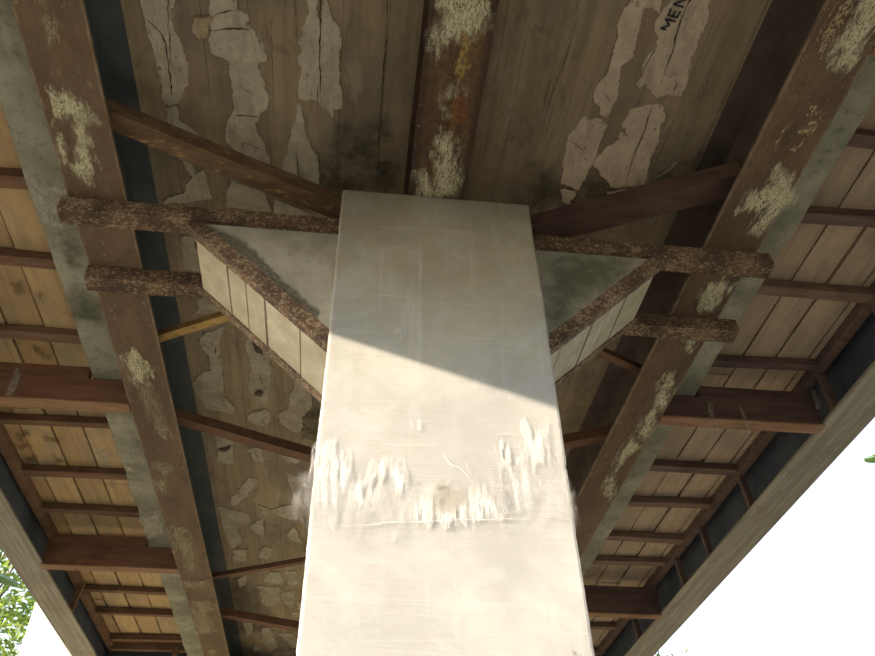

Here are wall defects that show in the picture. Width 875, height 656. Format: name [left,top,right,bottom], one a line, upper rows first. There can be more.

efflorescence [48,86,99,185]
peeling [140,0,199,136]
peeling [192,0,271,164]
peeling [282,0,343,185]
rust [454,33,474,81]
peeling [560,0,710,205]
efflorescence [827,0,875,71]
peeling [225,179,309,216]
efflorescence [735,162,797,236]
peeling [218,455,311,563]
leakage [326,441,350,511]
leakage [438,417,549,526]